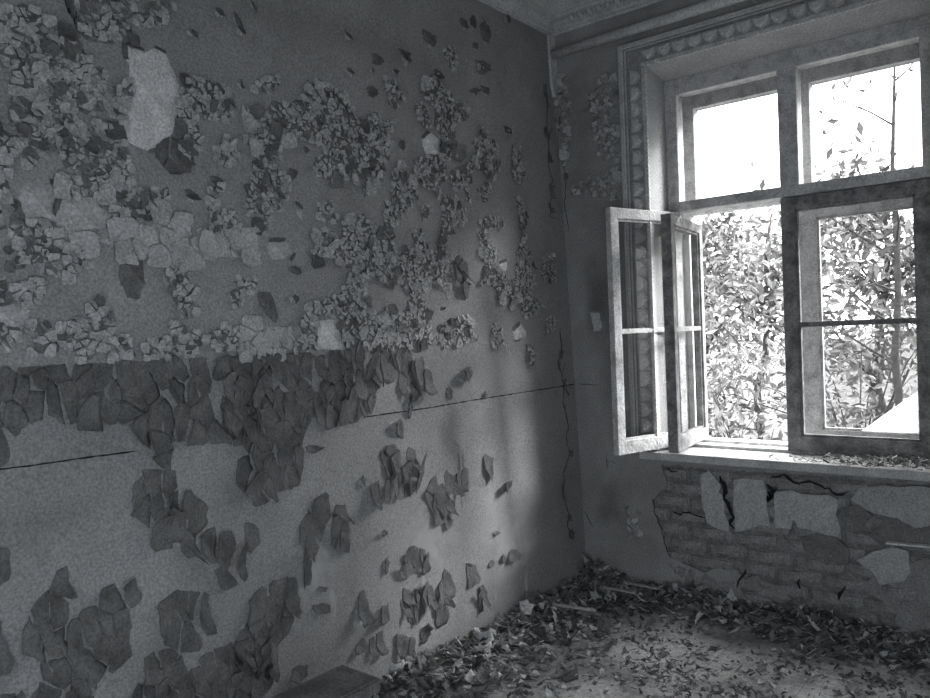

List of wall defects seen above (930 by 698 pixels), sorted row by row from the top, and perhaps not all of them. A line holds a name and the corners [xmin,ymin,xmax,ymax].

flaking render [0,0,546,698]
flaking render [636,468,930,629]